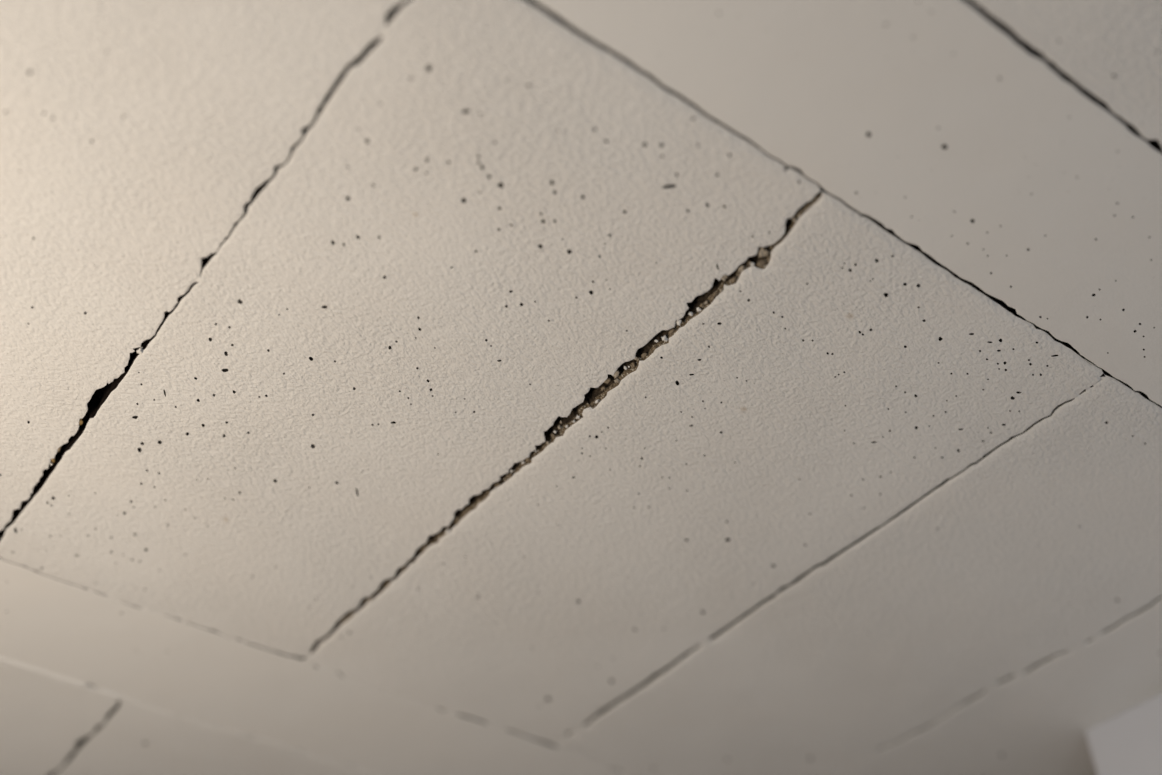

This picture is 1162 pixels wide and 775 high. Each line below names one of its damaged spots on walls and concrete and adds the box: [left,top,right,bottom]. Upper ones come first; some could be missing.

crack [0,0,411,609]
crack [166,0,1162,668]
crack [584,385,1093,726]